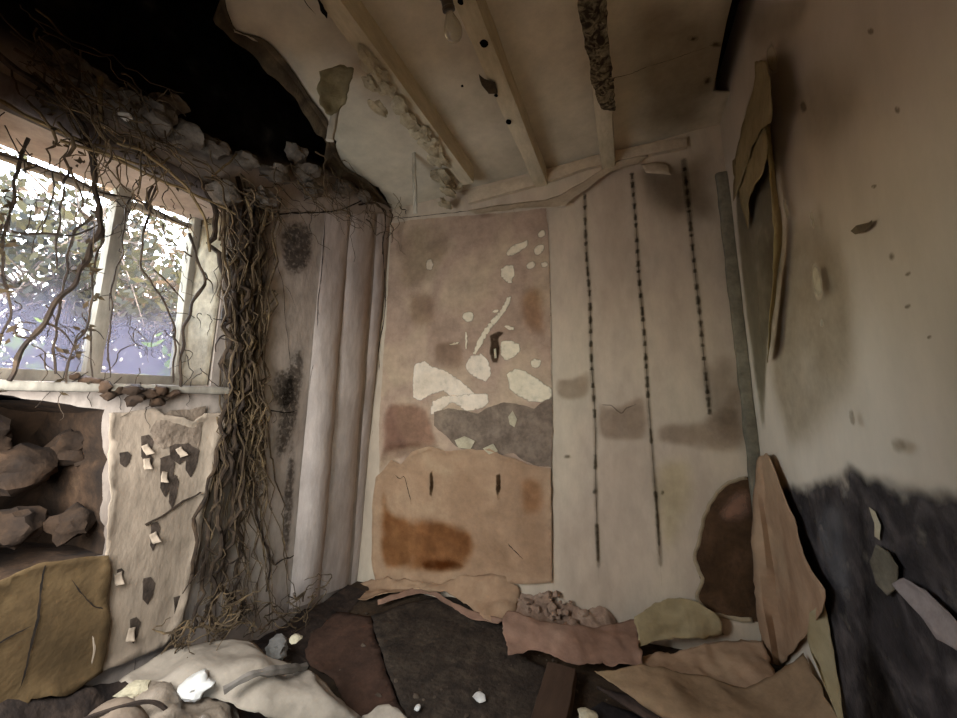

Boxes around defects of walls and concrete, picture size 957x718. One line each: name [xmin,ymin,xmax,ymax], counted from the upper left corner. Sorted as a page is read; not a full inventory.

crack [304,0,328,18]
peeling [577,0,616,111]
damp [284,226,310,269]
flaking render [317,43,553,473]
damp [274,353,301,452]
damp [631,172,659,535]
peeling [0,395,226,671]
damp [284,460,293,545]
damp [783,468,957,718]
spalling [112,679,151,698]